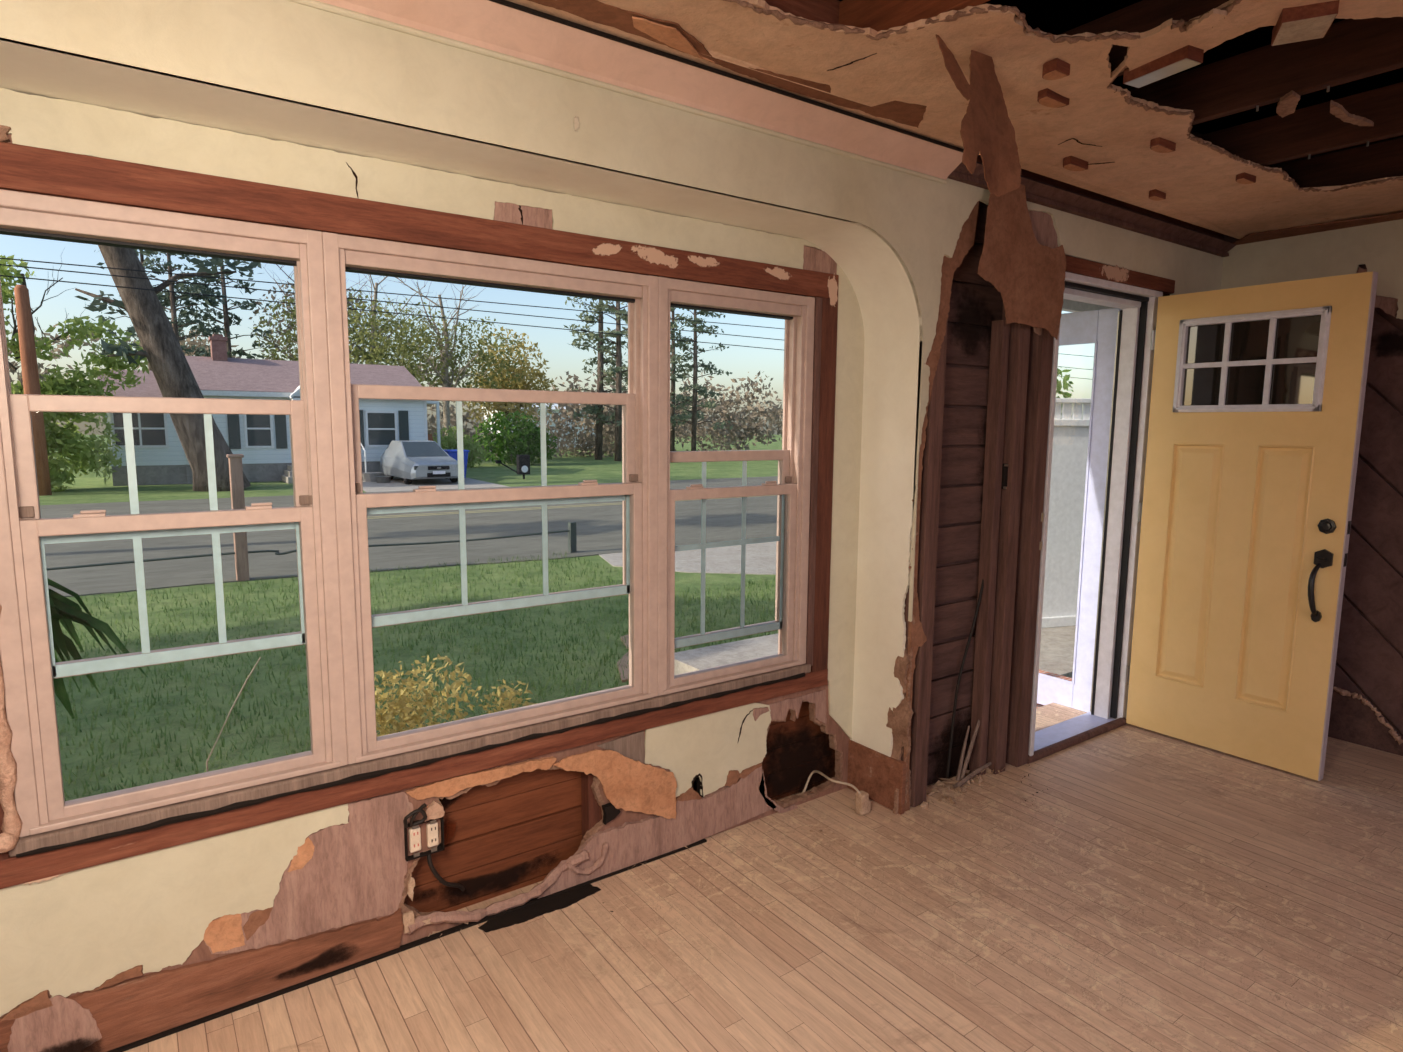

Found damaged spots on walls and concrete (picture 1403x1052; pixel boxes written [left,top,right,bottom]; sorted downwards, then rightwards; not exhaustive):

flaking render [723,0,1140,44]
flaking render [1171,0,1242,33]
peeling [493,201,552,229]
peeling [803,246,837,275]
peeling [1375,295,1398,317]
flaking render [886,201,979,814]
spalling [725,690,843,814]
peeling [204,731,703,954]
peeling [91,965,143,992]
leakage [277,944,352,979]
peeling [0,990,102,1052]
leakage [44,1039,99,1052]